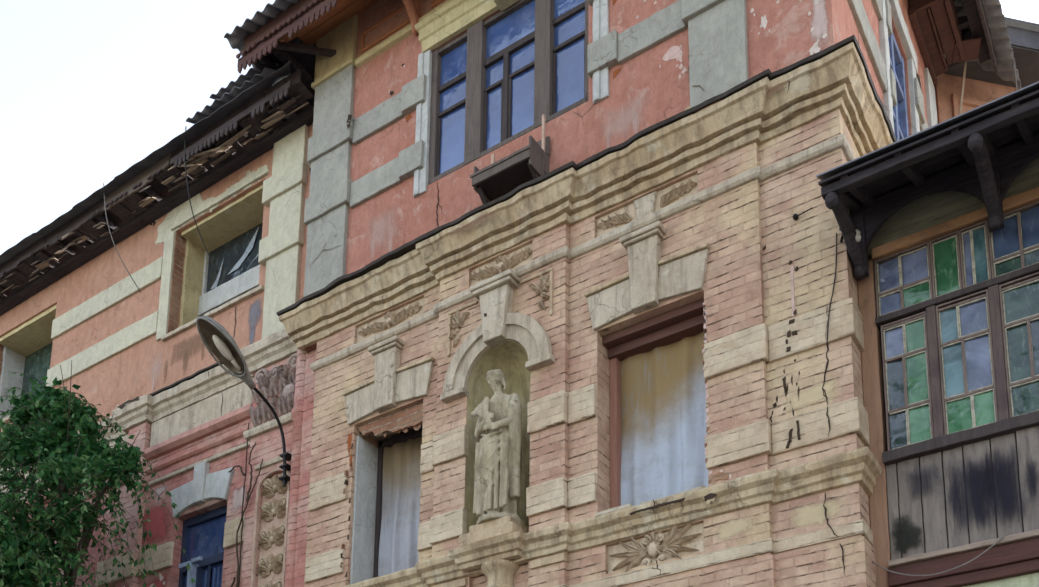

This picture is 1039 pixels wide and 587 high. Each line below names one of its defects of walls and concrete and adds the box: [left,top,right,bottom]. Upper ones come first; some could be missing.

peeling [799,0,828,55]
peeling [659,45,687,78]
crack [435,186,443,227]
spalling [770,309,801,449]
crack [822,305,831,436]
water stain [950,455,1015,520]
water stain [1027,464,1036,495]
crack [823,493,845,575]
mould [892,516,922,553]